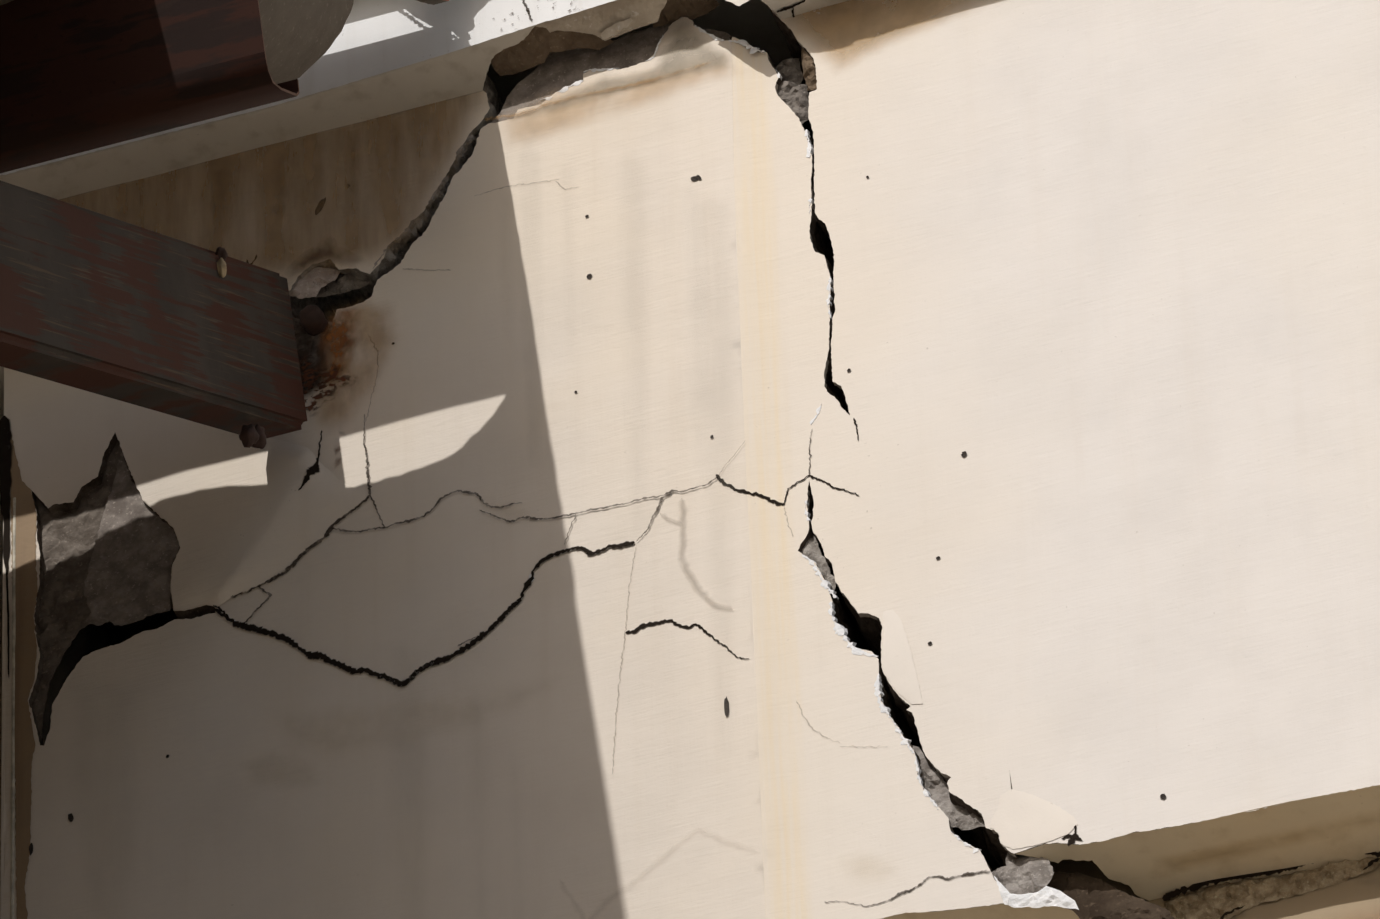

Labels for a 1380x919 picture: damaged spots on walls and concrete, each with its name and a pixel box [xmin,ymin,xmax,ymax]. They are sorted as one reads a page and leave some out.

spalling [491,0,766,123]
crack [289,74,503,322]
crack [767,0,859,440]
corrosion [292,311,353,411]
spalling [11,433,215,919]
crack [213,414,1313,919]
spalling [1164,857,1380,919]
crack [1363,852,1380,870]